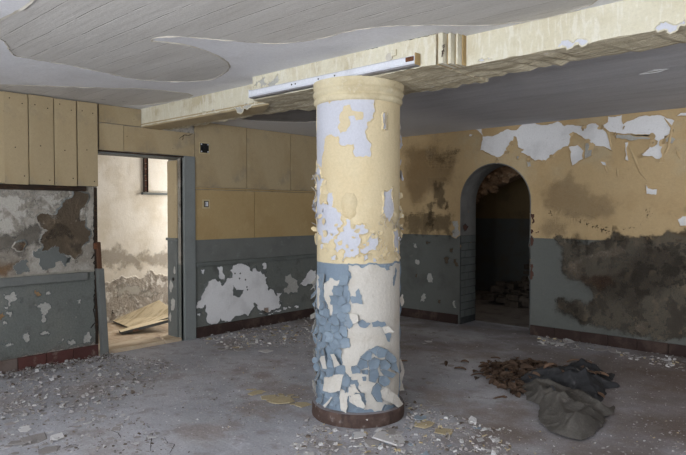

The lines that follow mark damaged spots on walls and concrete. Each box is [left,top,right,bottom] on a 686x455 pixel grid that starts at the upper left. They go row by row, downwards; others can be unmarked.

flaking render [556,38,589,50]
peeling [469,112,686,204]
peeling [0,291,18,326]
peeling [22,289,52,343]
flaking render [35,191,92,261]
peeling [66,331,92,347]
peeling [196,99,404,421]
damp [554,221,686,341]